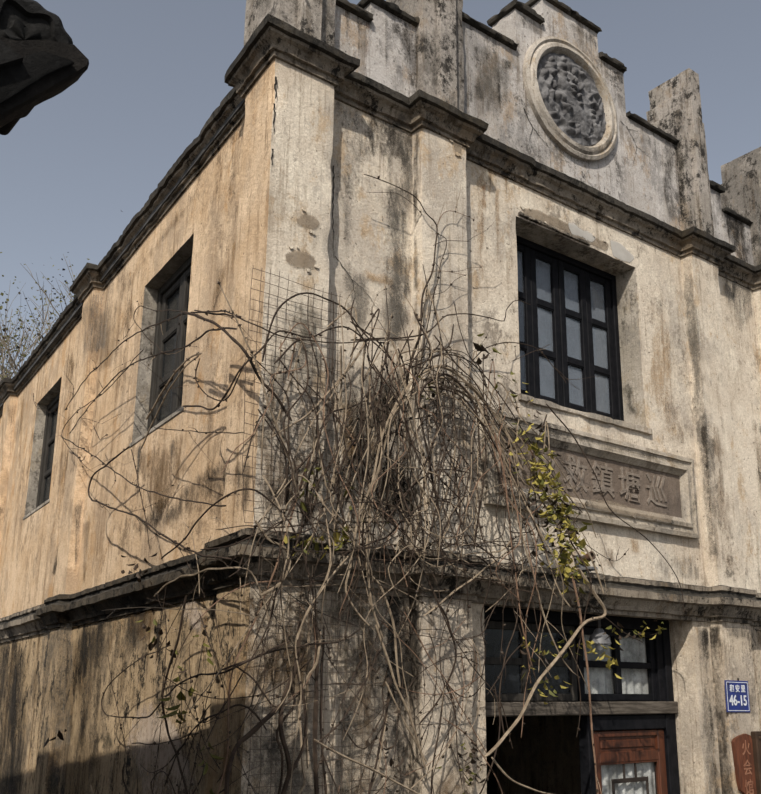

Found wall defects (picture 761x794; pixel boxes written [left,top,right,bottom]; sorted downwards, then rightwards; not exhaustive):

crack [270,76,278,165]
crack [332,165,373,305]
flaking render [520,206,608,251]
damp [665,129,687,213]
damp [685,283,719,476]
damp [0,642,25,794]
damp [43,611,154,794]